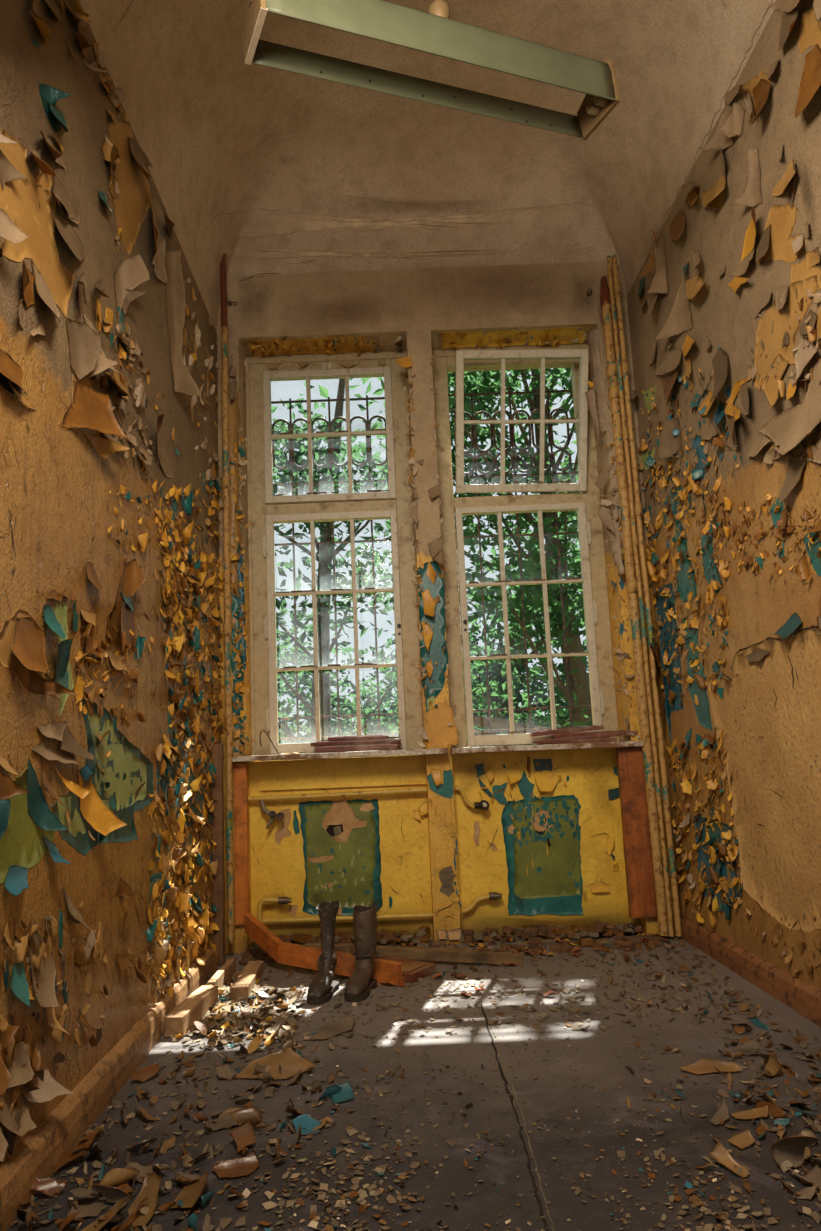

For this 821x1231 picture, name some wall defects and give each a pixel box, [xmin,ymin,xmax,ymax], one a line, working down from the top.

peeling [0,0,458,1163]
peeling [430,327,640,741]
flaking render [631,0,821,986]
flaking render [435,830,464,942]
peeling [475,756,569,847]
peeling [608,766,620,800]
peeling [31,1063,199,1231]
crack [481,1003,554,1231]
peeling [680,1023,821,1209]